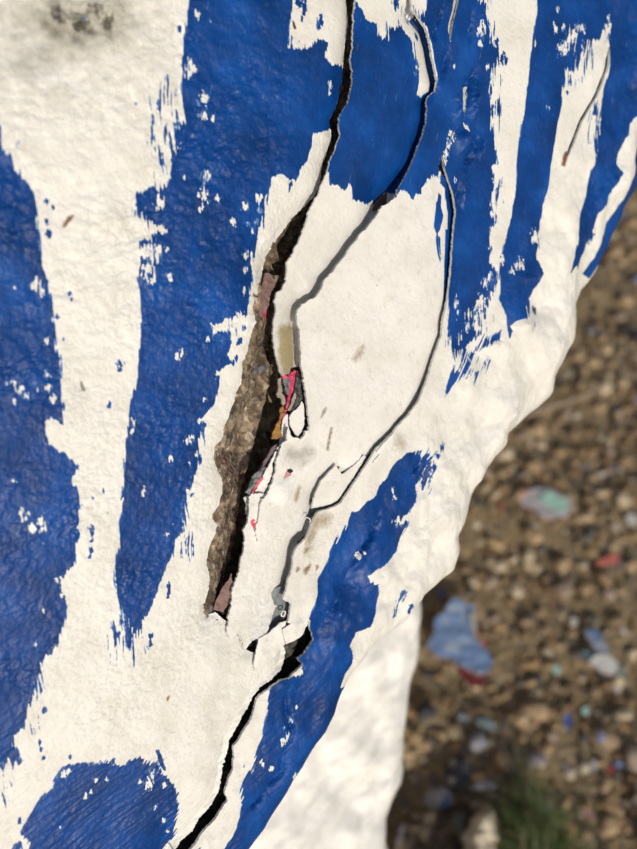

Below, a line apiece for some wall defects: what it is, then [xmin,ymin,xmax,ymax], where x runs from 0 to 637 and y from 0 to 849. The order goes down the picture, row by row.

crack [264,86,341,293]
crack [372,193,387,211]
peeling [203,0,484,671]
crack [307,453,371,518]
crack [176,586,306,849]